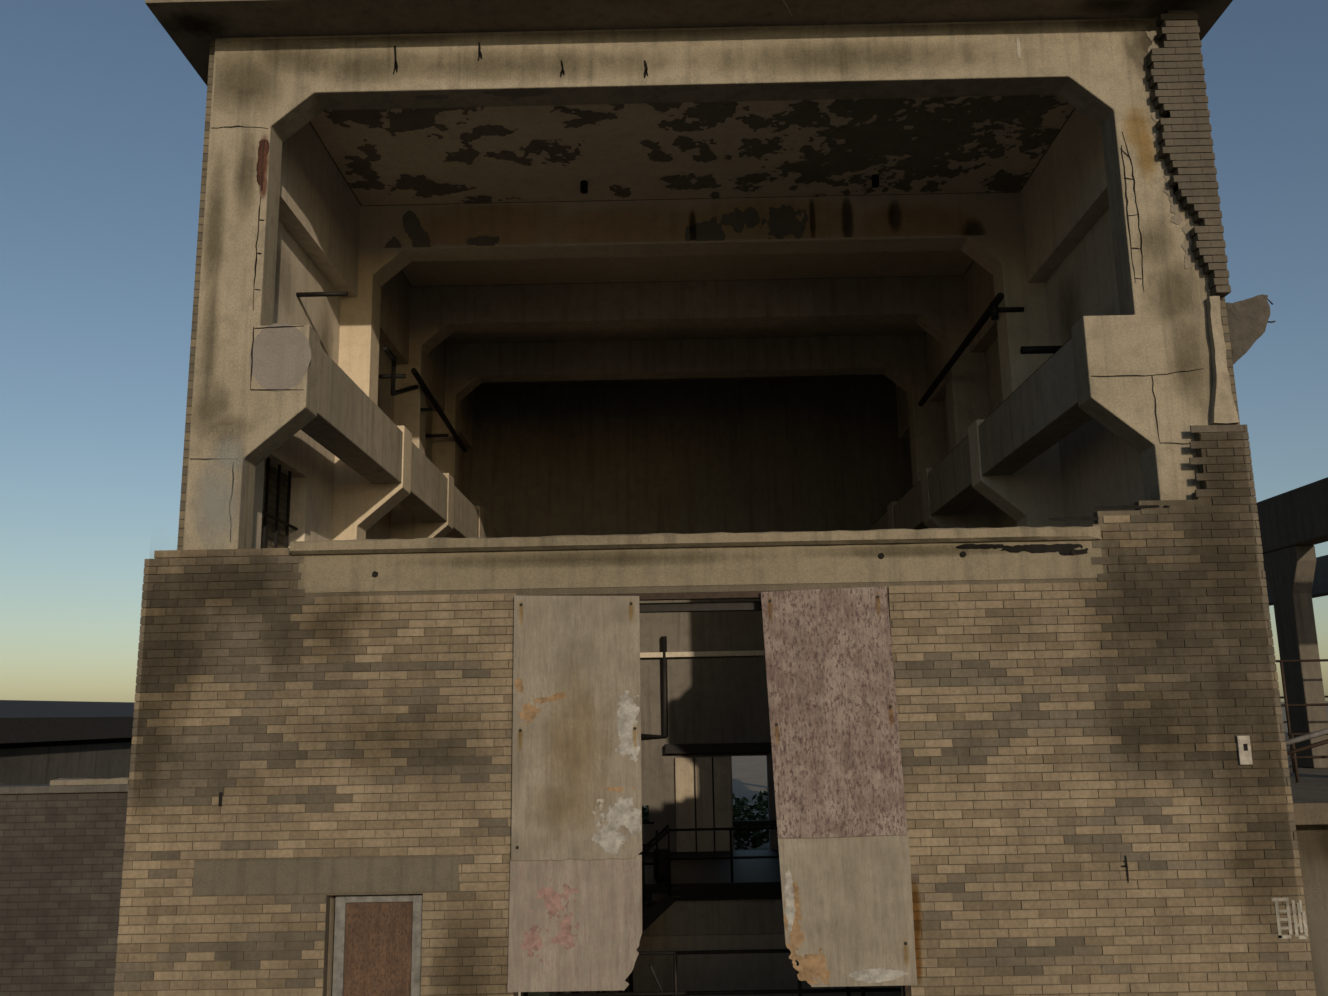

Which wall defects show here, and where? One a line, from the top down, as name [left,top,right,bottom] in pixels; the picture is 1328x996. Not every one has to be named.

peeling [323,88,625,248]
peeling [639,81,1069,241]
crack [250,196,304,391]
crack [1092,368,1204,445]
crack [190,458,234,542]
peeling [615,672,640,763]
peeling [592,787,641,854]